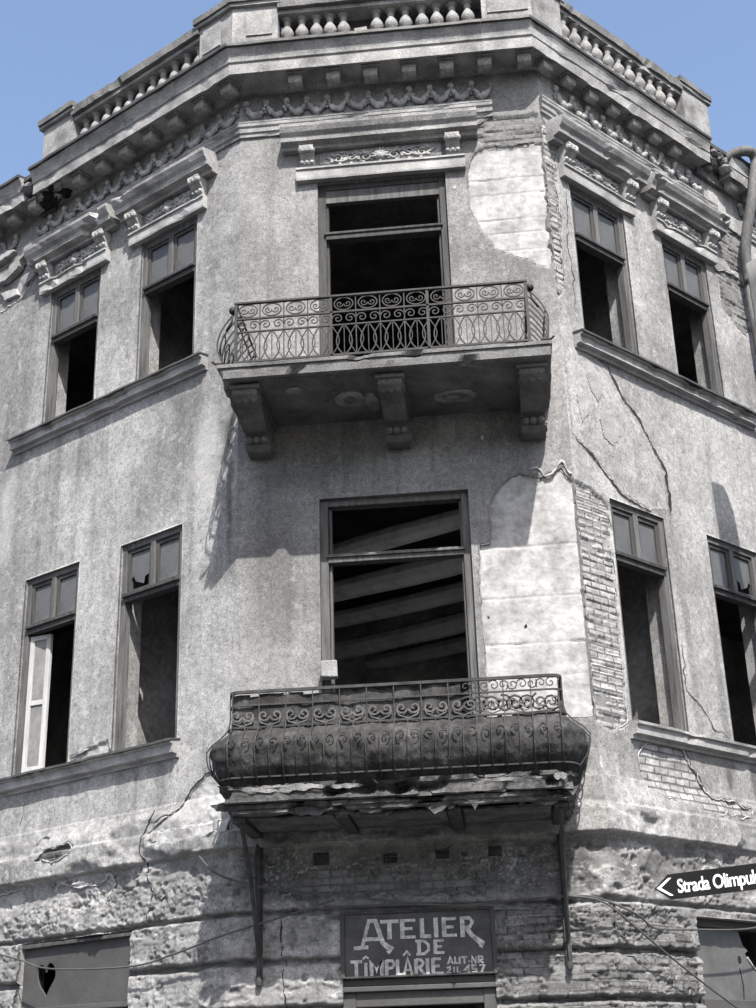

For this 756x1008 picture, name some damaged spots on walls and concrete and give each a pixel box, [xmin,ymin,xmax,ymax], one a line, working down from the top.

spalling [453,142,553,268]
crack [576,355,672,514]
spalling [479,459,595,718]
crack [139,769,213,923]
spalling [147,770,240,845]
spalling [236,783,394,817]
spalling [401,795,495,815]
spalling [473,772,578,806]
spalling [637,742,754,820]
crack [280,922,288,1008]